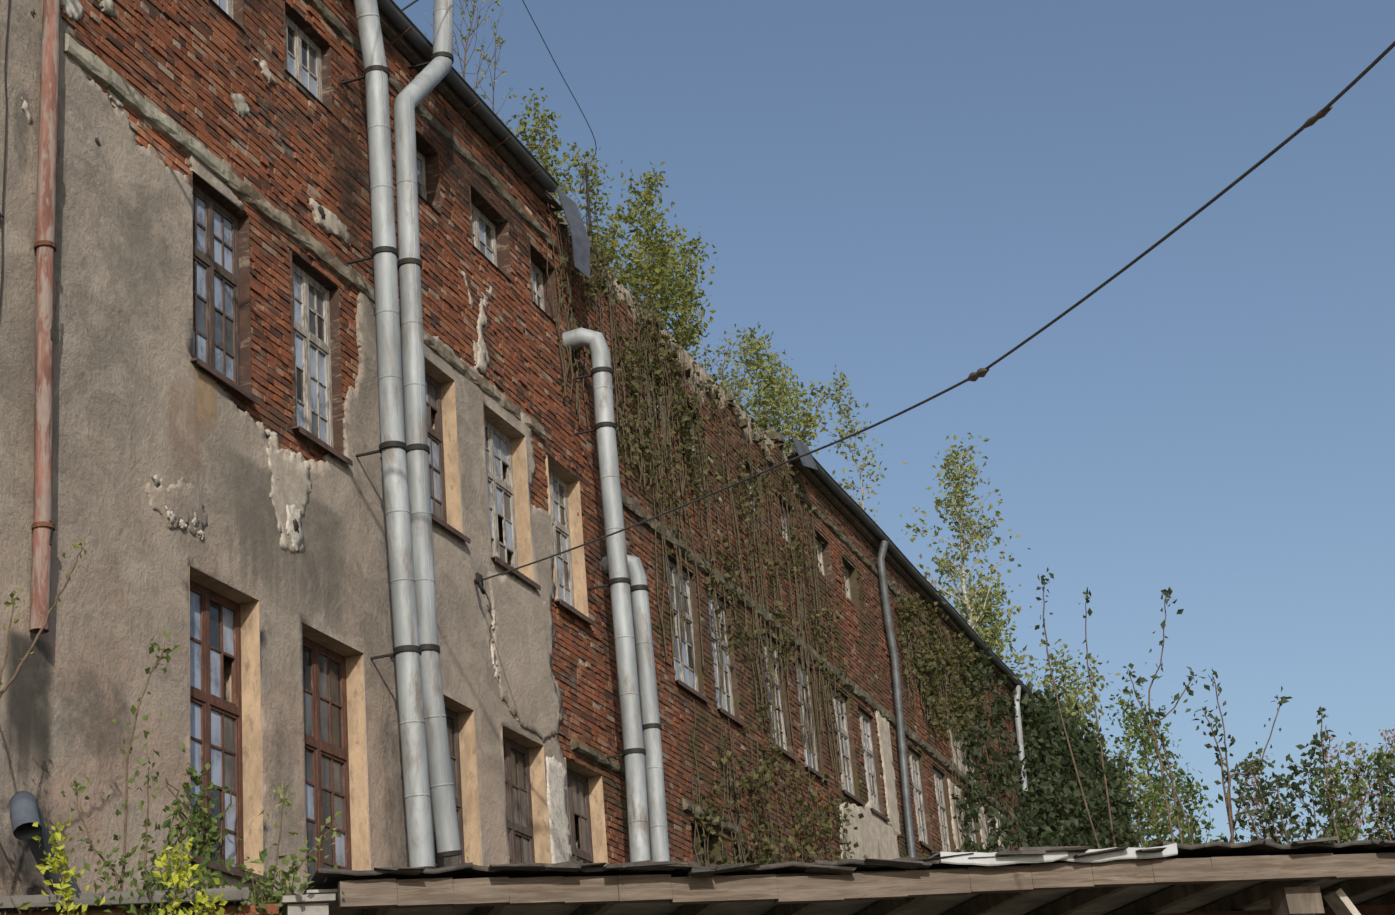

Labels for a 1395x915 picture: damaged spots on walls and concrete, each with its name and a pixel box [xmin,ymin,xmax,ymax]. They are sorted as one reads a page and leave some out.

spalling [198,198,359,554]
crack [485,591,493,650]
damp [9,633,49,763]